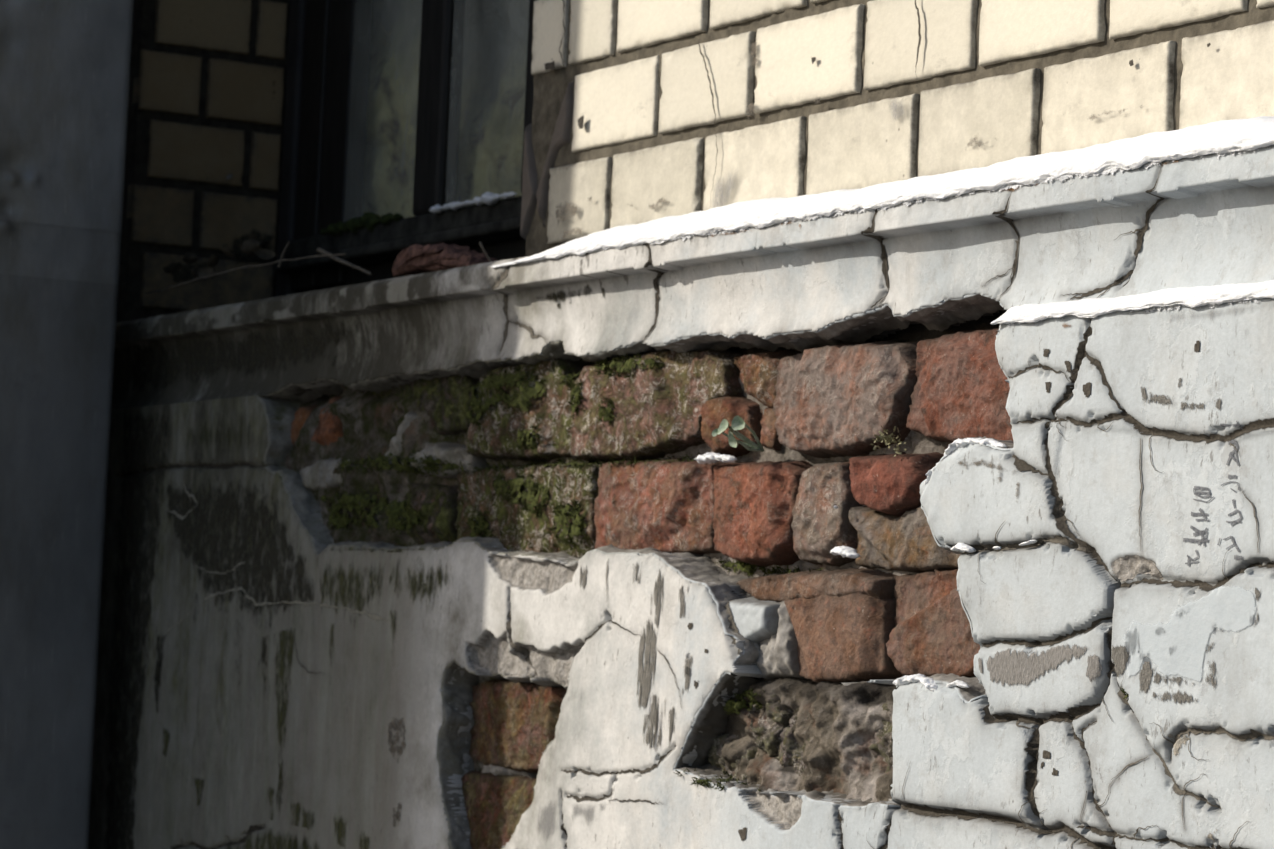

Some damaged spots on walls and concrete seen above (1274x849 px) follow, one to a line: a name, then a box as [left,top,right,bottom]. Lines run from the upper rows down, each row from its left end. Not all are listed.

crack [492,258,547,352]
crack [642,243,664,342]
crack [861,209,889,308]
crack [962,165,1274,591]
crack [122,462,263,520]
leakage [105,416,446,849]
crack [162,562,390,637]
crack [723,591,746,654]
spalling [257,294,1261,849]
crack [837,617,1274,849]
crack [561,745,676,848]